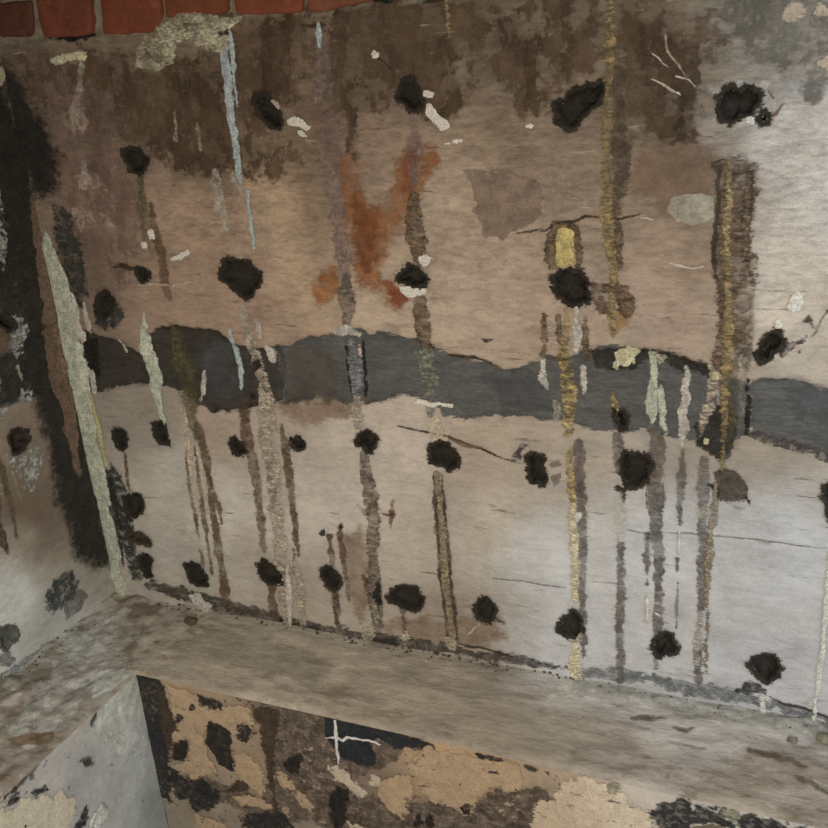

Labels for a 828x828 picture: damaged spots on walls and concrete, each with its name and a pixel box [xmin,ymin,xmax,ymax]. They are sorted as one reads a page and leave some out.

rust [339,145,439,310]
damp [489,0,828,471]
rust [312,266,339,303]
damp [139,117,828,737]
damp [44,570,88,619]
peeling [0,789,77,828]
peeling [166,684,290,818]
peeling [276,771,314,813]
peeling [327,745,537,820]
peeling [529,775,654,828]
damp [747,748,828,794]